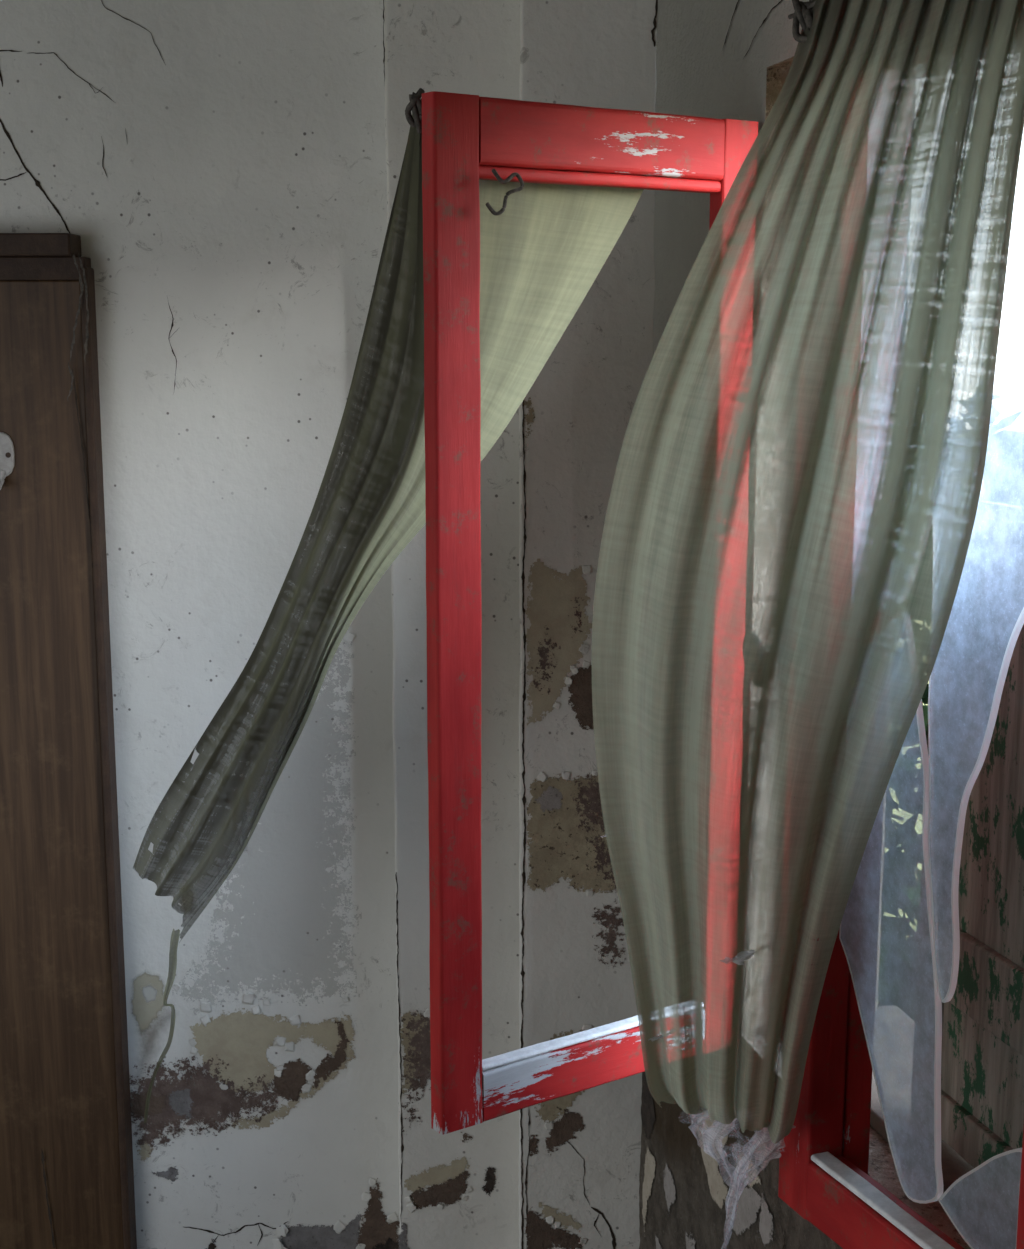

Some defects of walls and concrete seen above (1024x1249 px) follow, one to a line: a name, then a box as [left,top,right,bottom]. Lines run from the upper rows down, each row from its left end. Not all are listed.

crack [101,0,166,65]
crack [0,119,70,233]
crack [0,50,127,176]
peeling [525,559,594,730]
peeling [527,770,626,967]
peeling [129,1005,356,1182]
peeling [272,1132,496,1249]
flaking render [641,1072,676,1249]
peeling [685,1230,696,1249]
peeling [697,1112,773,1245]